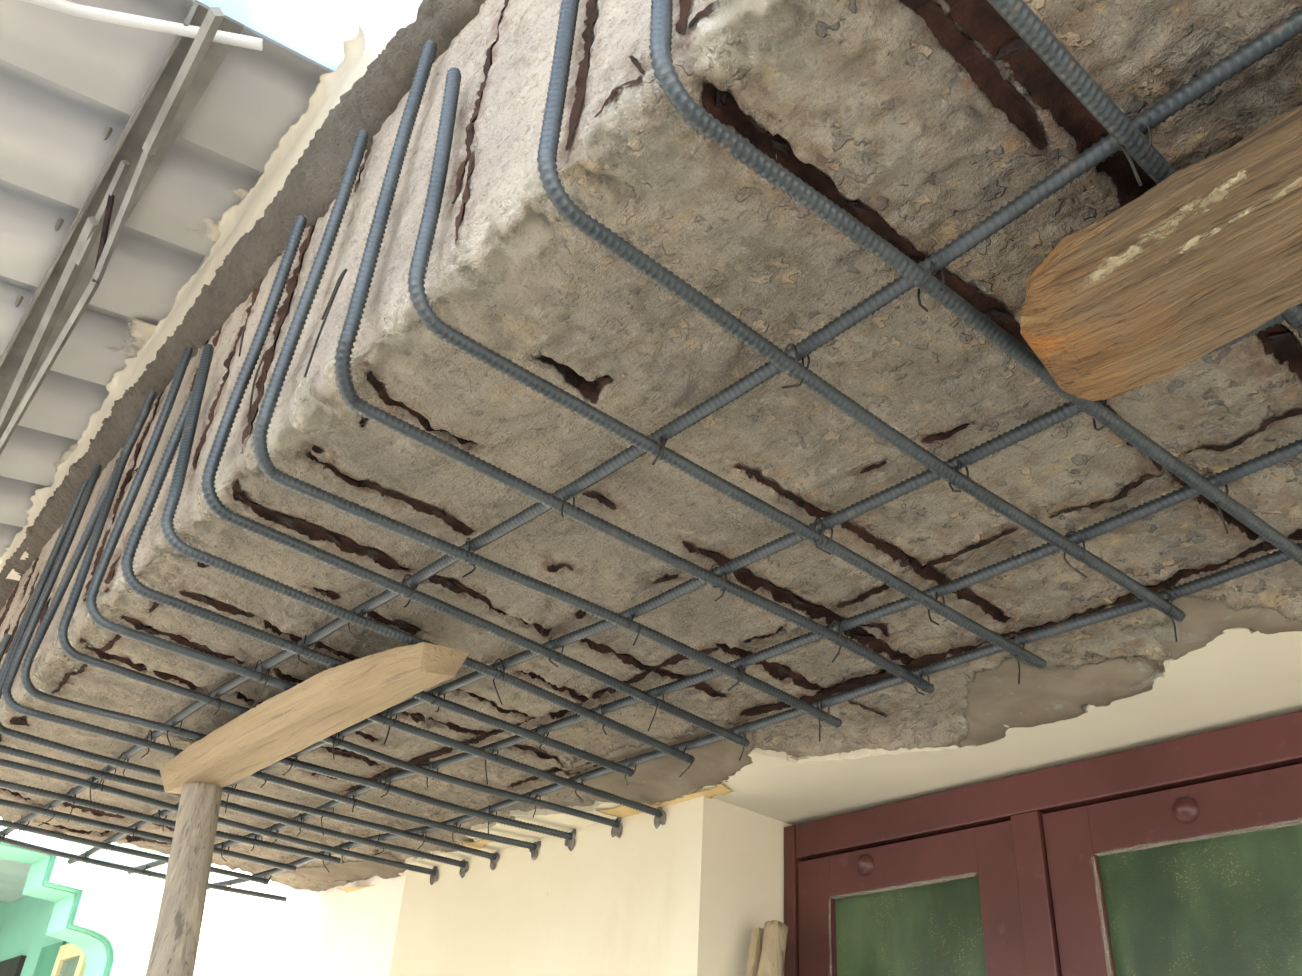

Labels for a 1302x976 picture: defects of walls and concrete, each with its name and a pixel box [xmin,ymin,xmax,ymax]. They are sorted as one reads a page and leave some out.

corrosion [451,0,509,246]
spalling [349,0,770,494]
corrosion [565,0,597,151]
spalling [555,0,901,352]
corrosion [702,85,1034,353]
spalling [671,0,1080,257]
corrosion [898,0,1109,154]
spalling [1023,0,1302,120]
corrosion [232,480,411,572]
spalling [0,89,1171,892]
corrosion [311,459,1302,791]
spalling [798,287,1302,620]